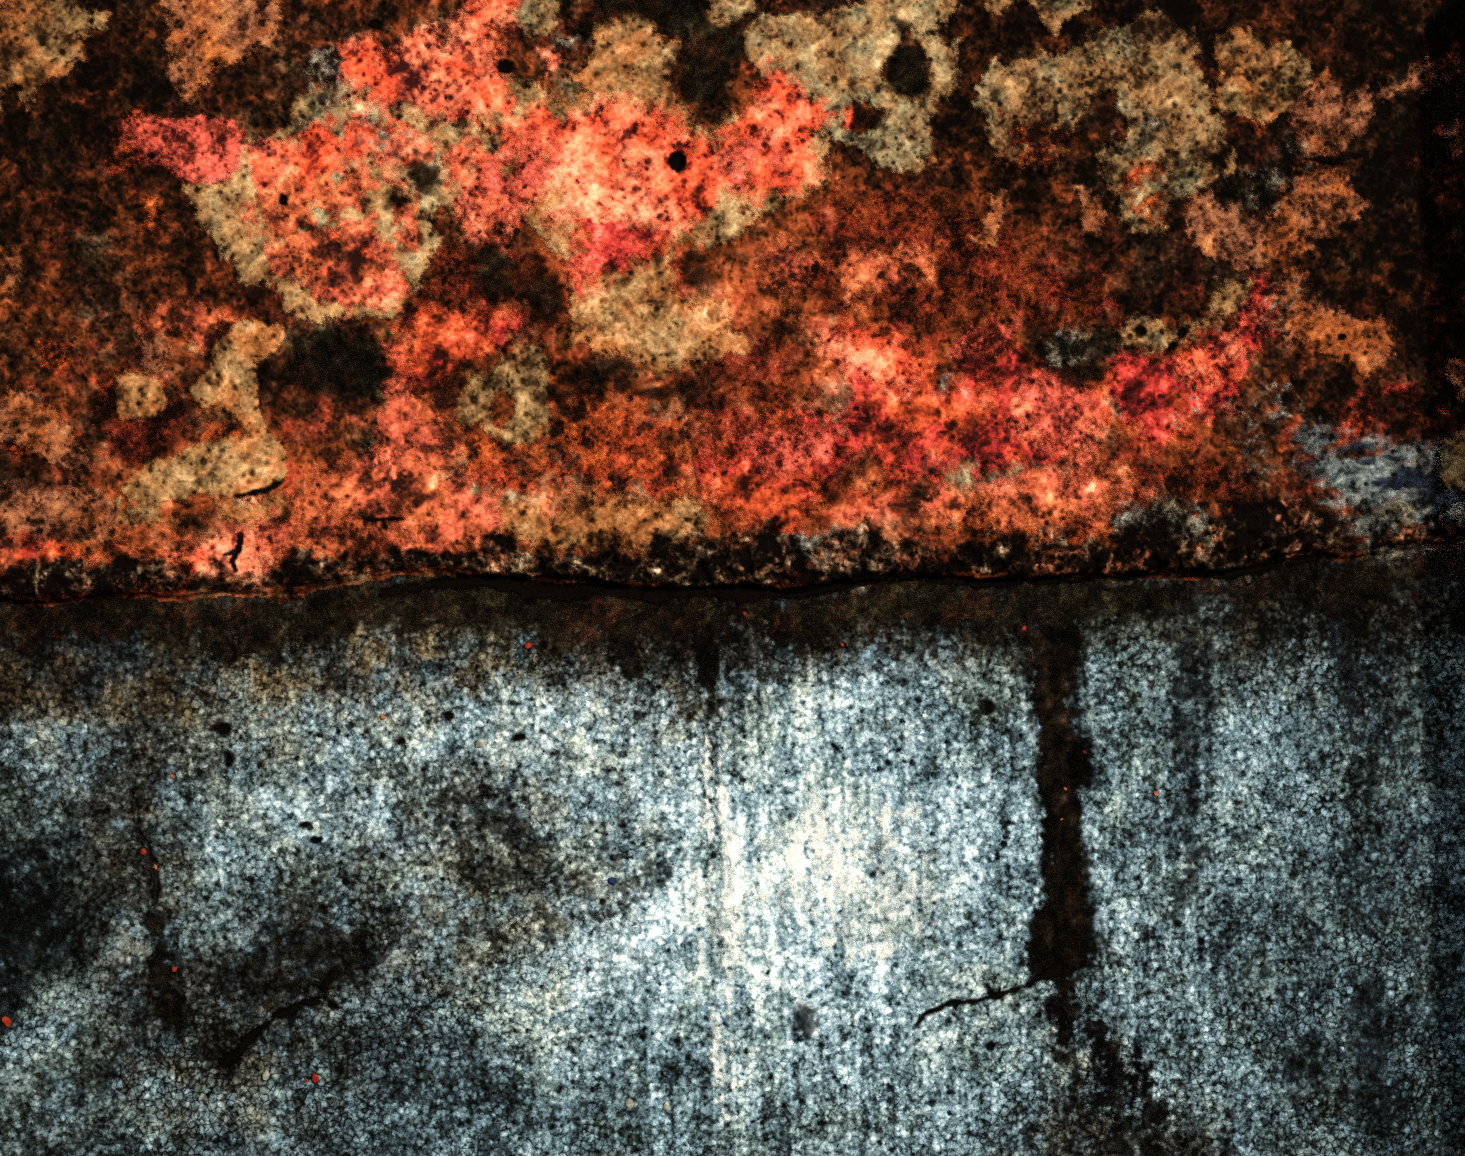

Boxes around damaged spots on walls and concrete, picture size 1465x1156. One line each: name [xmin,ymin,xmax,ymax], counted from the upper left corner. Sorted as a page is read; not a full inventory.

corrosion [105,109,144,173]
corrosion [143,196,163,237]
corrosion [803,183,1126,333]
corrosion [997,108,1068,169]
corrosion [1122,160,1171,225]
corrosion [74,351,242,471]
corrosion [462,320,855,533]
corrosion [949,437,1256,548]
damp [0,544,1465,1156]
crack [914,962,1064,1029]